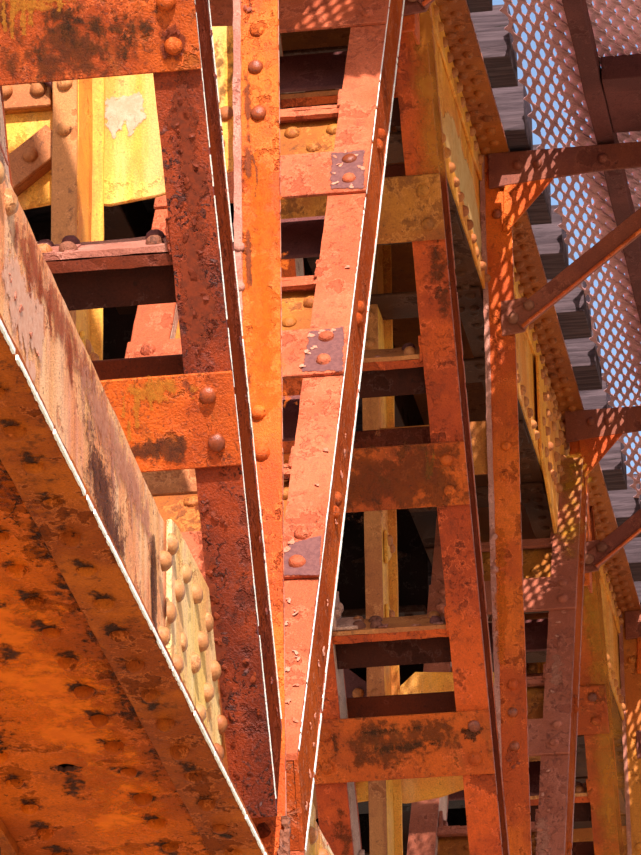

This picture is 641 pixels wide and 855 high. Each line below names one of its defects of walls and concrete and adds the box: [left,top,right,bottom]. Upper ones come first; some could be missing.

corrosion [44,7,75,25]
corrosion [215,44,233,102]
corrosion [9,221,130,569]
corrosion [130,435,187,463]
corrosion [150,534,158,628]
corrosion [0,583,118,778]
corrosion [220,732,229,774]
corrosion [460,727,484,742]
corrosion [87,751,159,855]
corrosion [331,810,352,854]